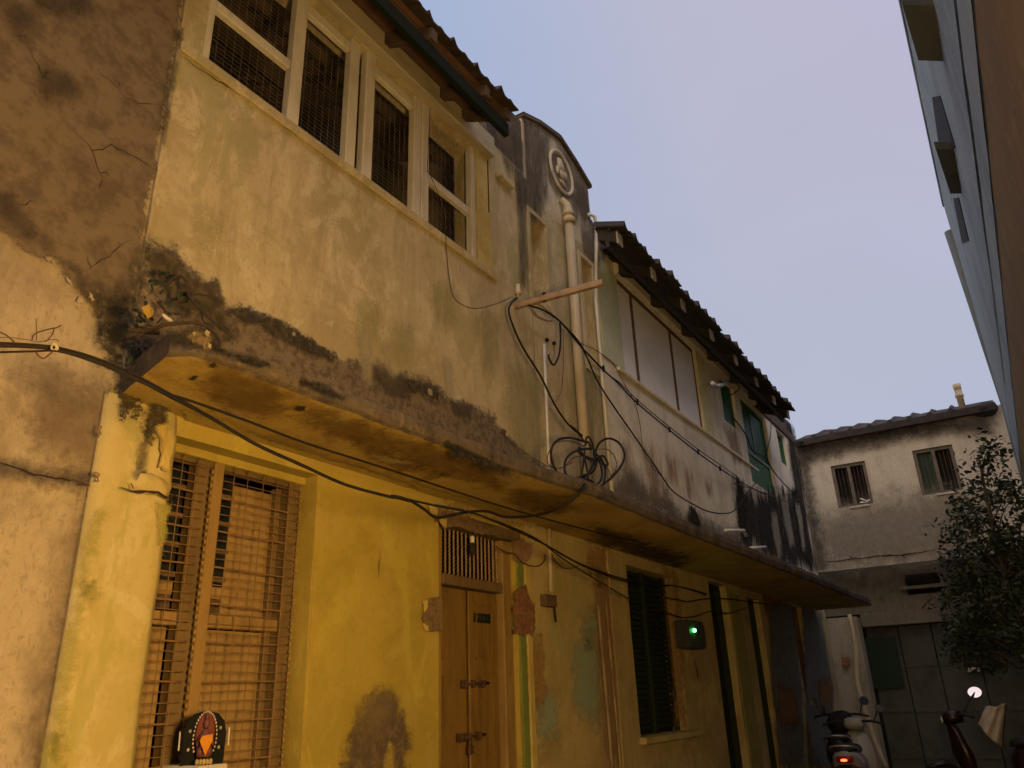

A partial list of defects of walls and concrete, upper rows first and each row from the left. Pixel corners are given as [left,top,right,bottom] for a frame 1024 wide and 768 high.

crack [76,133,158,188]
damp [71,241,546,477]
crack [0,462,90,486]
damp [305,410,572,514]
damp [614,416,994,572]
crack [829,549,936,562]
flaking render [422,596,443,632]
spalling [512,584,546,706]
damp [384,743,394,768]